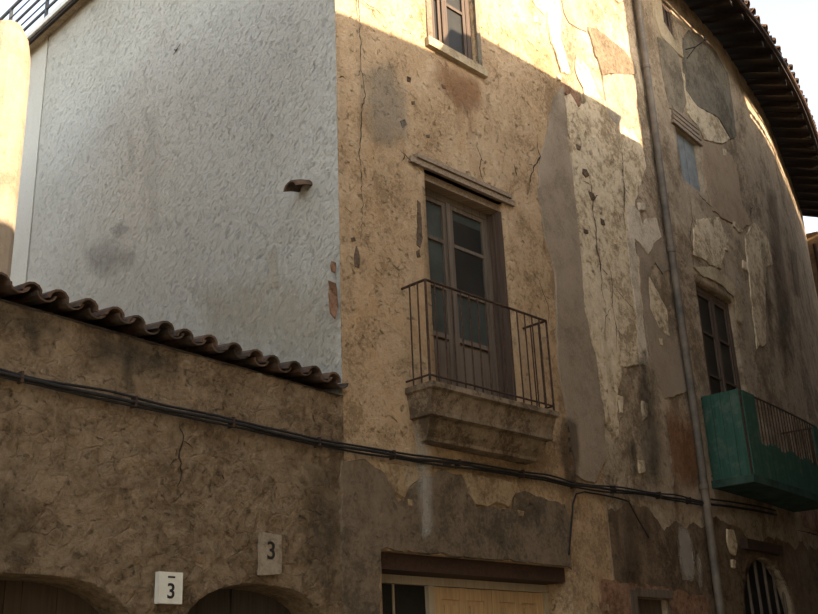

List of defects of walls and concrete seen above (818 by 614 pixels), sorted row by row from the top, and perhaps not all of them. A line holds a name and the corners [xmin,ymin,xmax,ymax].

crack [339,0,380,237]
flaking render [531,0,670,440]
crack [170,424,193,487]
flaking render [379,461,424,506]
flaking render [463,472,524,516]
flaking render [726,529,738,569]
flaking render [578,579,709,614]